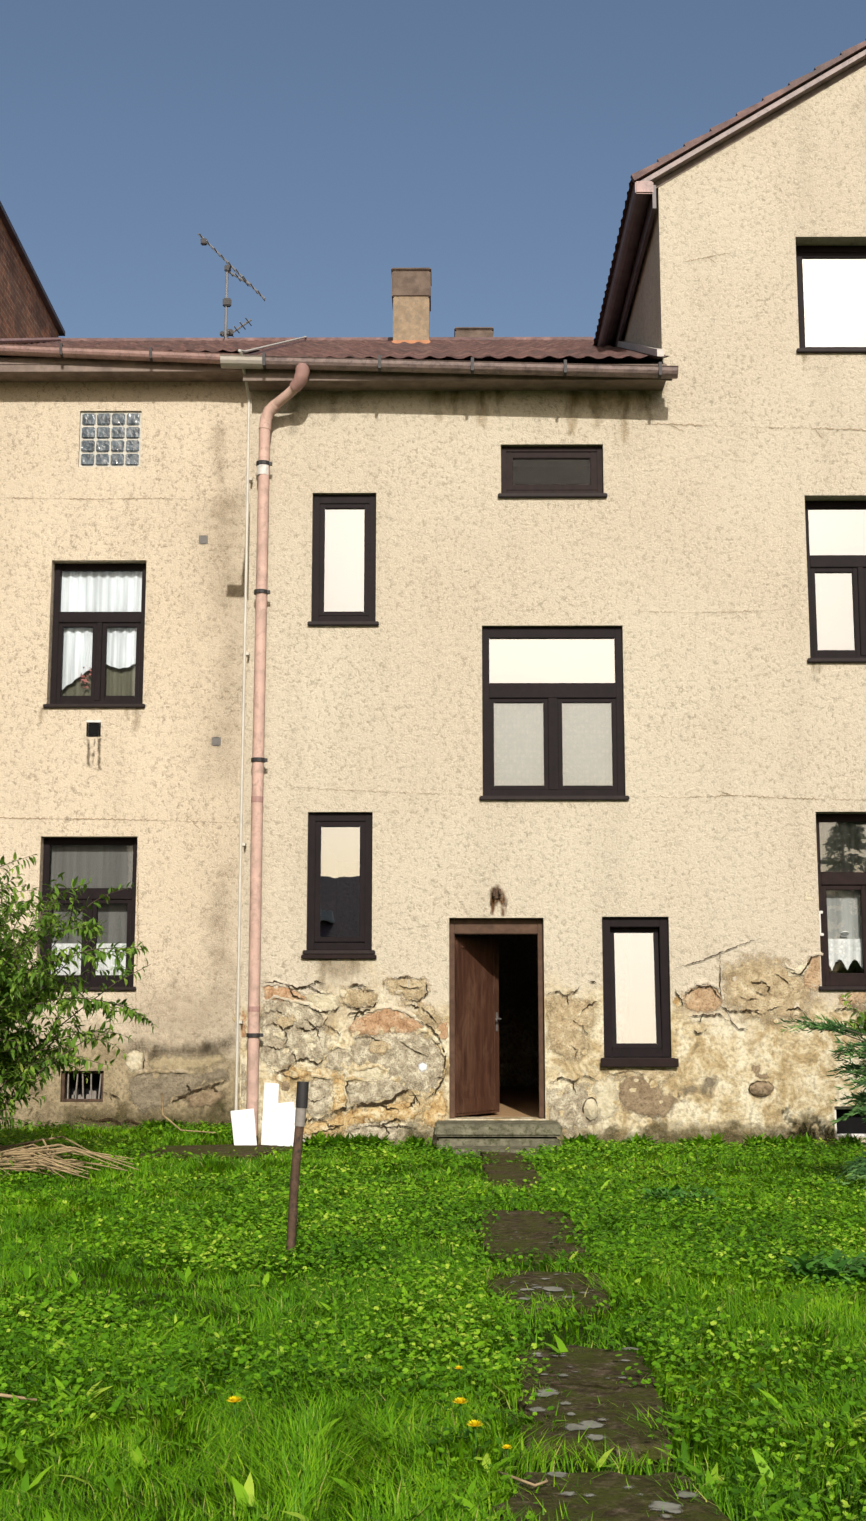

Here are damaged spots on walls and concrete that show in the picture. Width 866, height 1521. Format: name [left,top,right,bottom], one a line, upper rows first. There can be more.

flaking render [126,975,450,1141]
flaking render [545,980,597,1062]
flaking render [673,951,824,1025]
flaking render [836,991,866,1014]
flaking render [546,1067,680,1132]